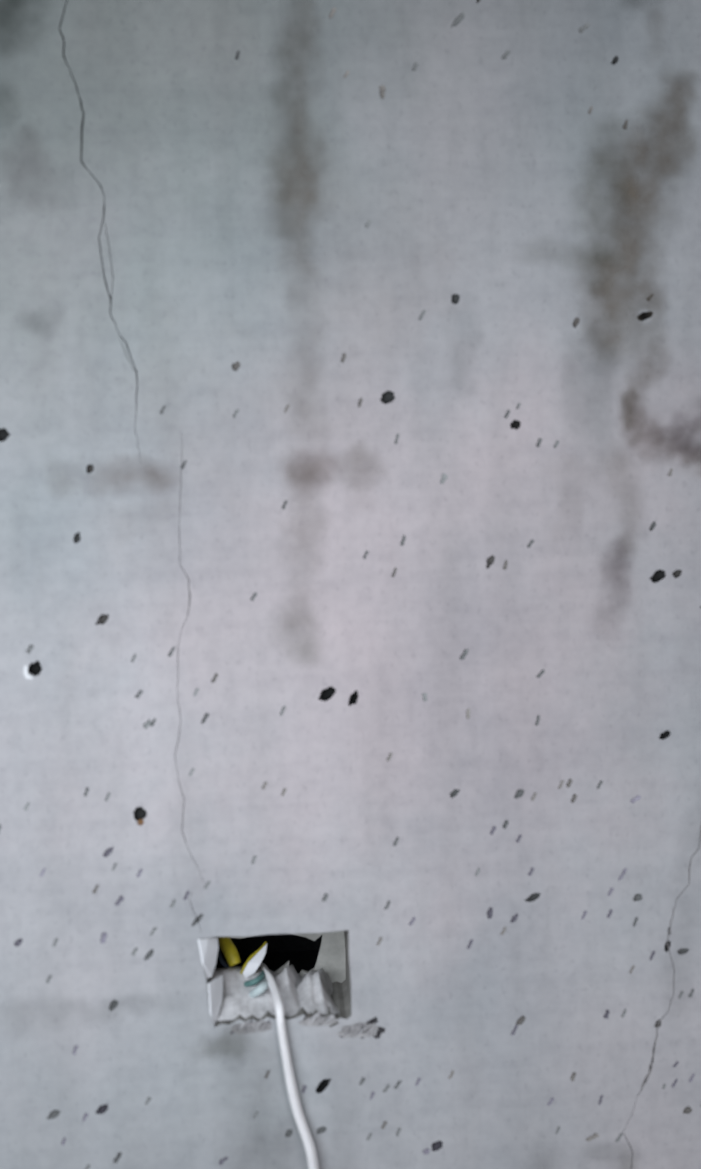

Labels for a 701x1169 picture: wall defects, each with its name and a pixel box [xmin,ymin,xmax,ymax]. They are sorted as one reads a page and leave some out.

crack [59,0,141,462]
crack [175,435,204,931]
crack [623,827,701,1169]